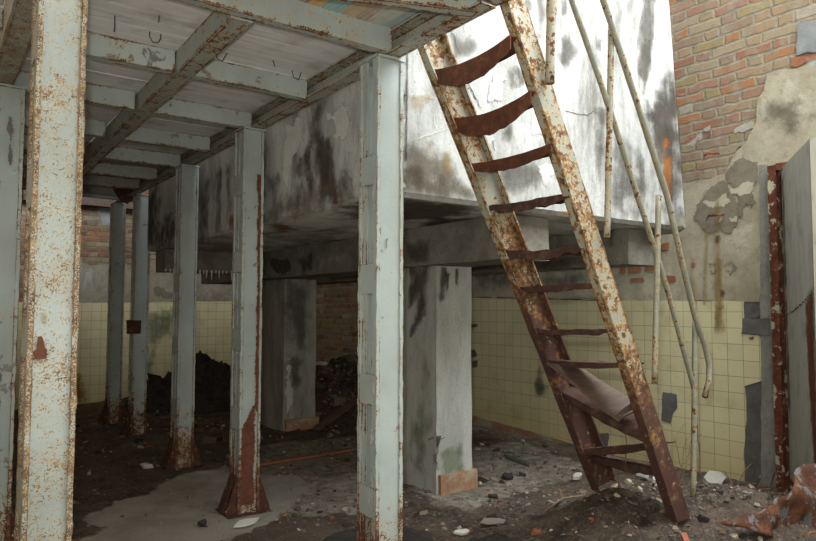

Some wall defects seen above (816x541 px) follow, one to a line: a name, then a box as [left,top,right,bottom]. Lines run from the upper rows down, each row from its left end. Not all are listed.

damp [561,38,574,64]
damp [639,0,653,81]
spalling [790,54,816,67]
damp [269,103,359,219]
damp [403,148,474,226]
damp [504,166,539,190]
corrosion [663,137,671,197]
damp [648,79,710,212]
peeling [676,158,758,234]
damp [407,244,428,337]
corrosion [33,336,48,359]
corrosion [238,156,265,505]